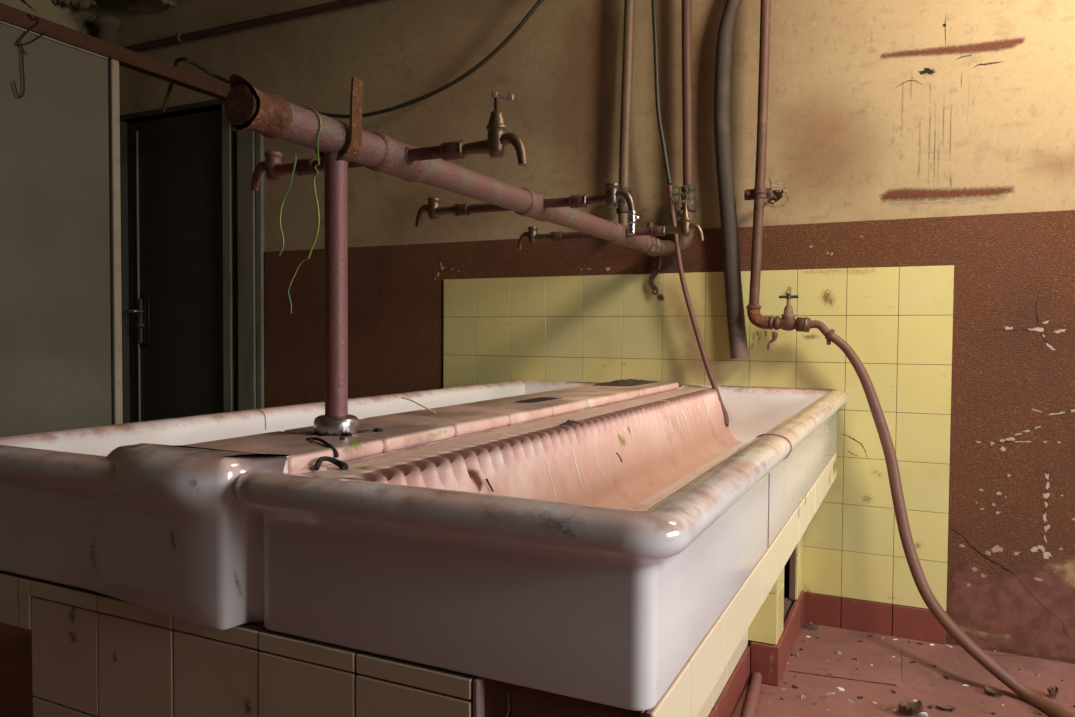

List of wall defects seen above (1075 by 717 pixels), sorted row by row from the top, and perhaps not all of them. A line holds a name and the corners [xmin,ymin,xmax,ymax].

peeling [989,313,1067,350]
peeling [975,426,1061,451]
crack [954,530,1069,636]
flaking render [949,474,1075,664]